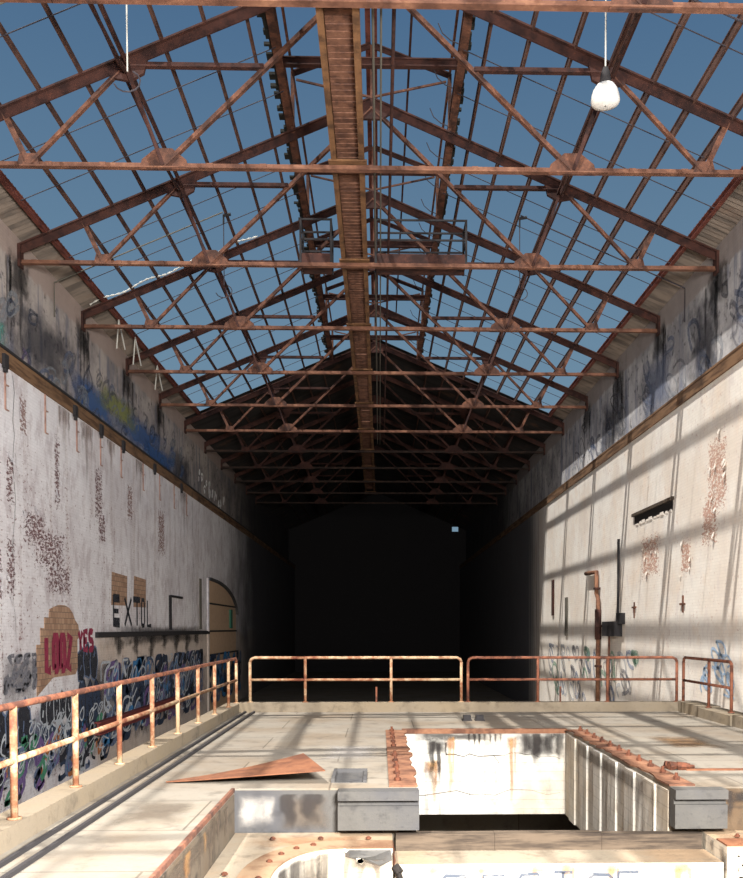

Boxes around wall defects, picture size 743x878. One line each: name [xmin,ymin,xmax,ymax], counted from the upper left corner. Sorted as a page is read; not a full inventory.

peeling [6,453,15,507]
peeling [700,426,727,546]
peeling [0,506,72,603]
peeling [679,539,691,578]
water stain [429,742,447,772]
crack [446,753,560,763]